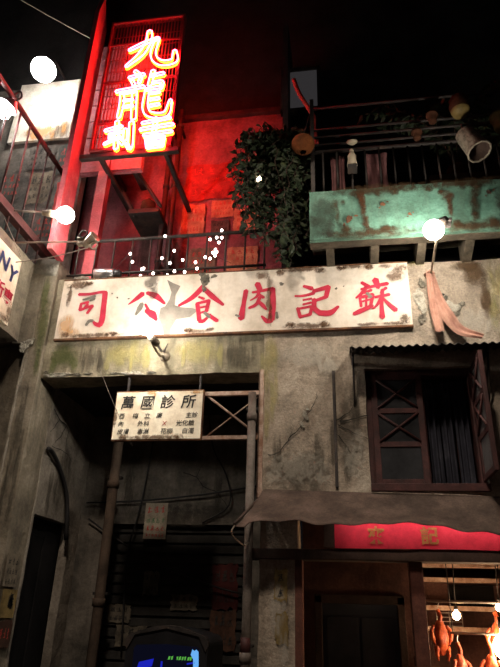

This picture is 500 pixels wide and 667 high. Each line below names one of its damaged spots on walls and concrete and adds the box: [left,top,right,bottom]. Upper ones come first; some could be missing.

corrosion [330,184,415,239]
corrosion [426,177,500,231]
peeling [412,278,427,324]
spalling [442,293,465,316]
damp [454,262,491,312]
crack [268,394,317,463]